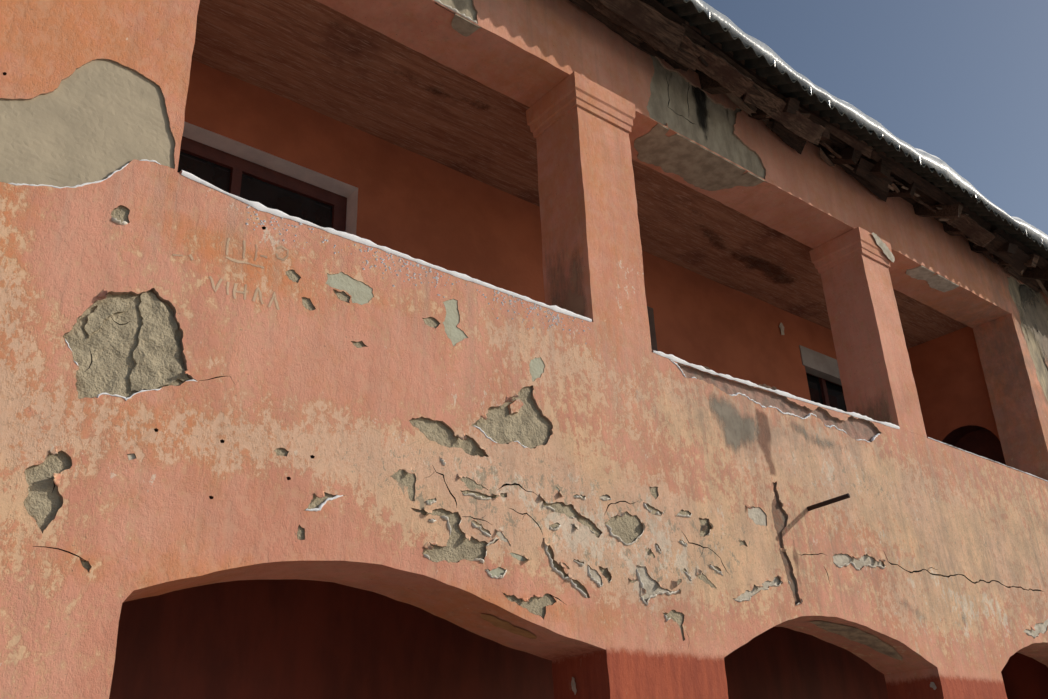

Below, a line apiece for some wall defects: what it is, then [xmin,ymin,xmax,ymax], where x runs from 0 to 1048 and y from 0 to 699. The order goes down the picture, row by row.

spalling [434,0,481,37]
spalling [0,59,176,189]
spalling [634,55,766,191]
spalling [63,288,198,401]
leakage [1017,285,1048,361]
spalling [409,357,553,466]
spalling [24,449,72,533]
peeling [390,468,530,579]
peeling [502,592,557,619]
peeling [540,487,723,606]
peeling [733,481,803,606]
crack [883,550,1044,592]